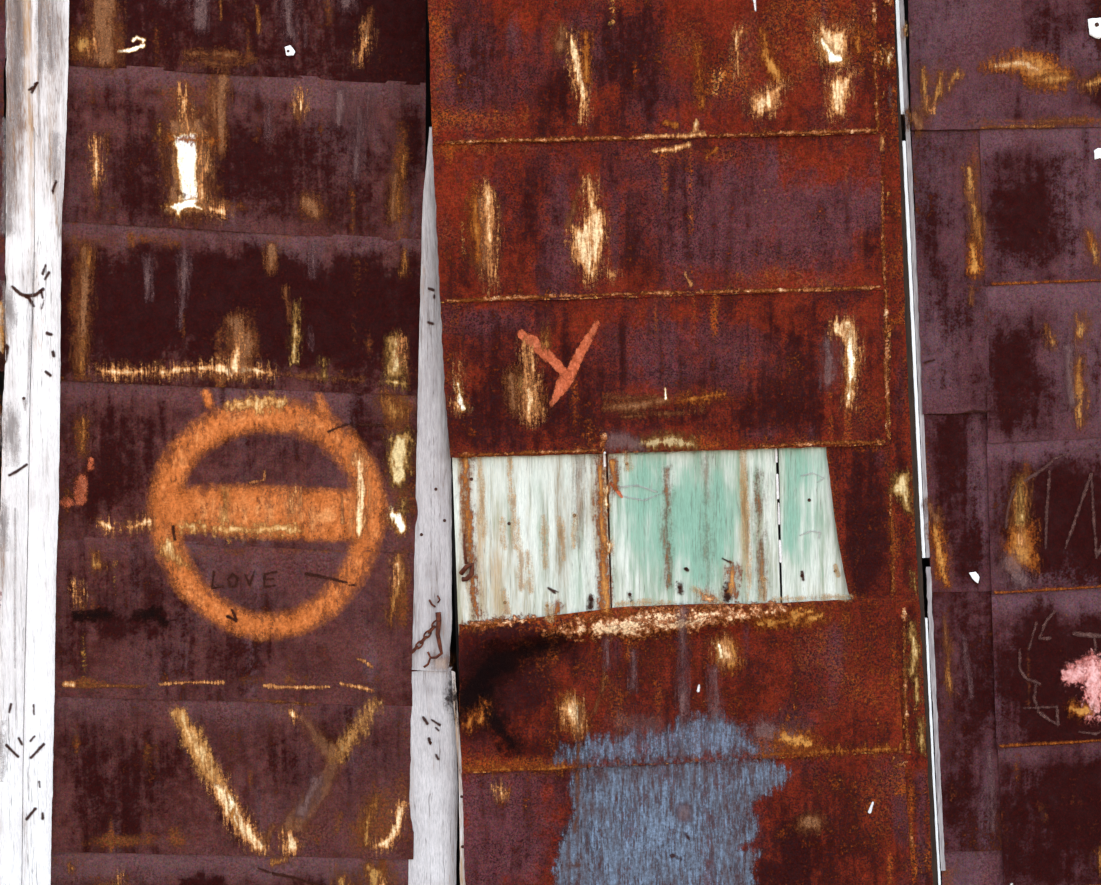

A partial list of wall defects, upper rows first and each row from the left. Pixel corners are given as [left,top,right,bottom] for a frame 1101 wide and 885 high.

corrosion [70,0,126,72]
corrosion [445,3,884,160]
corrosion [976,46,1101,96]
corrosion [89,131,110,211]
corrosion [961,162,1101,306]
corrosion [69,241,365,382]
corrosion [446,179,890,448]
corrosion [96,514,156,535]
corrosion [921,497,952,589]
corrosion [555,664,608,740]
corrosion [711,634,745,676]
corrosion [758,607,910,769]